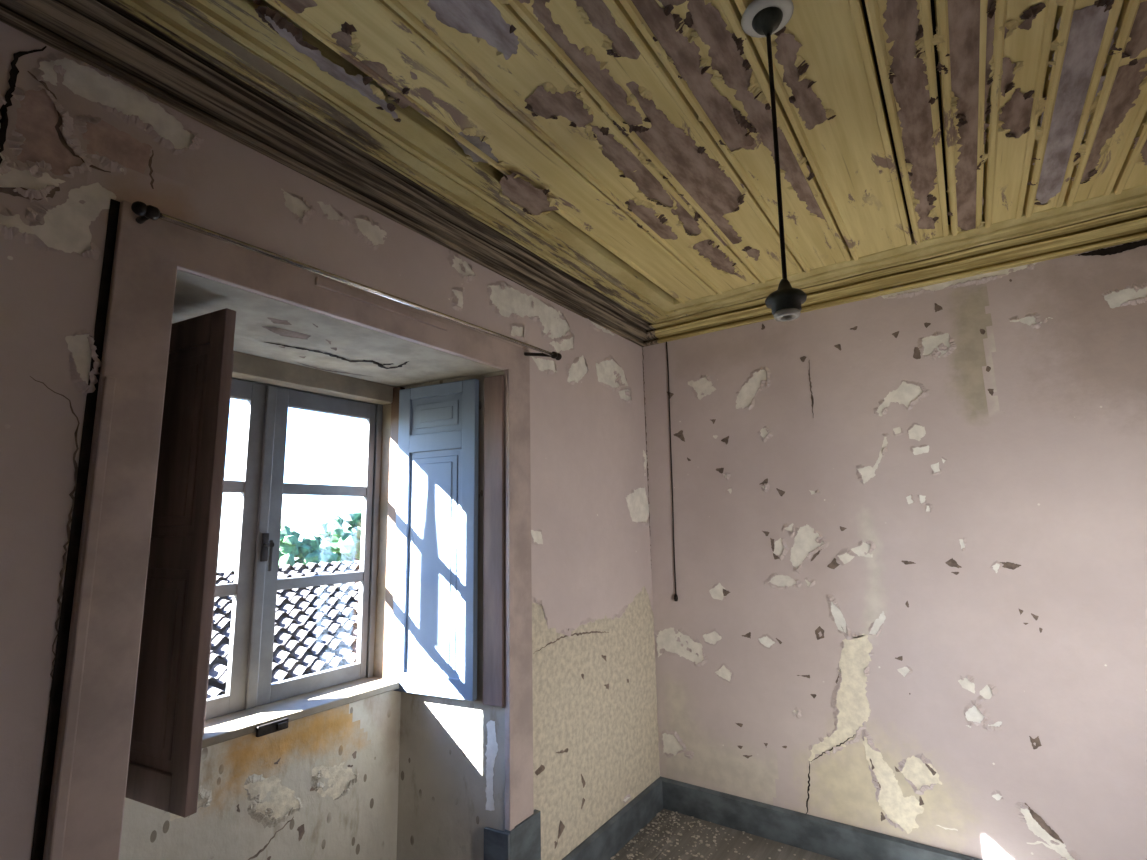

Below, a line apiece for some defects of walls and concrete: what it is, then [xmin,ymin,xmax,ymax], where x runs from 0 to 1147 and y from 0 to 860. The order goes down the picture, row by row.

crack [0,46,111,173]
crack [147,150,155,189]
peeling [252,0,417,122]
peeling [424,0,826,275]
peeling [771,26,836,130]
peeling [883,0,1147,234]
crack [266,342,410,377]
crack [535,629,609,652]
peeling [532,586,734,860]
peeling [808,594,942,834]
crack [248,816,294,860]
peeling [991,790,1081,860]